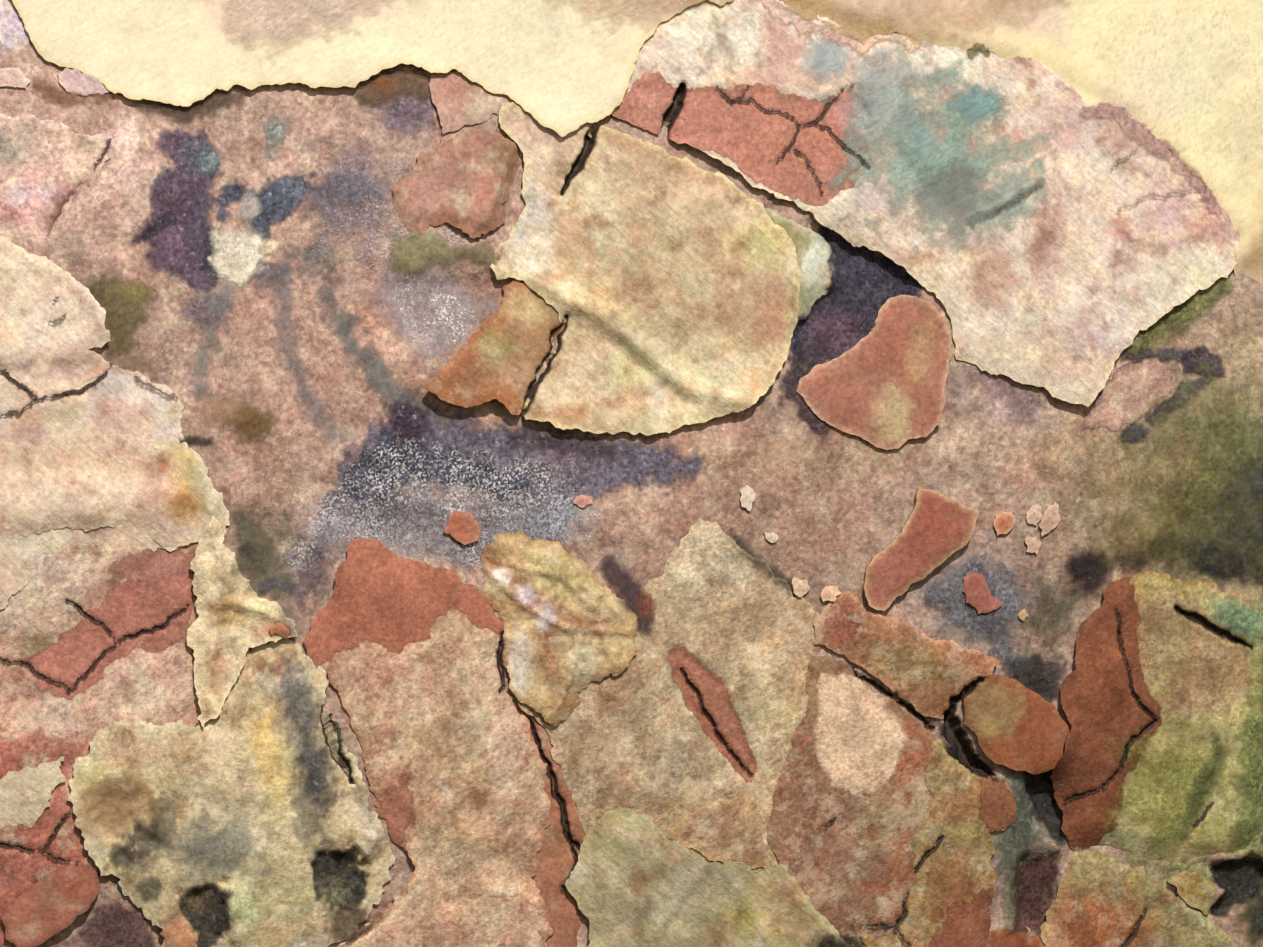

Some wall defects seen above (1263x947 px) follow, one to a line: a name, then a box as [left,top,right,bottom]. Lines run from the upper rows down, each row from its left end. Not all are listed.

spalling [0,68,31,89]
crack [560,122,601,195]
crack [661,83,686,138]
peeling [12,0,1263,450]
crack [522,315,569,415]
damp [1118,345,1225,443]
peeling [0,112,230,947]
crack [1175,606,1253,650]
crack [851,666,995,776]
crack [529,717,581,893]
damp [1180,737,1222,834]
damp [1209,713,1263,941]